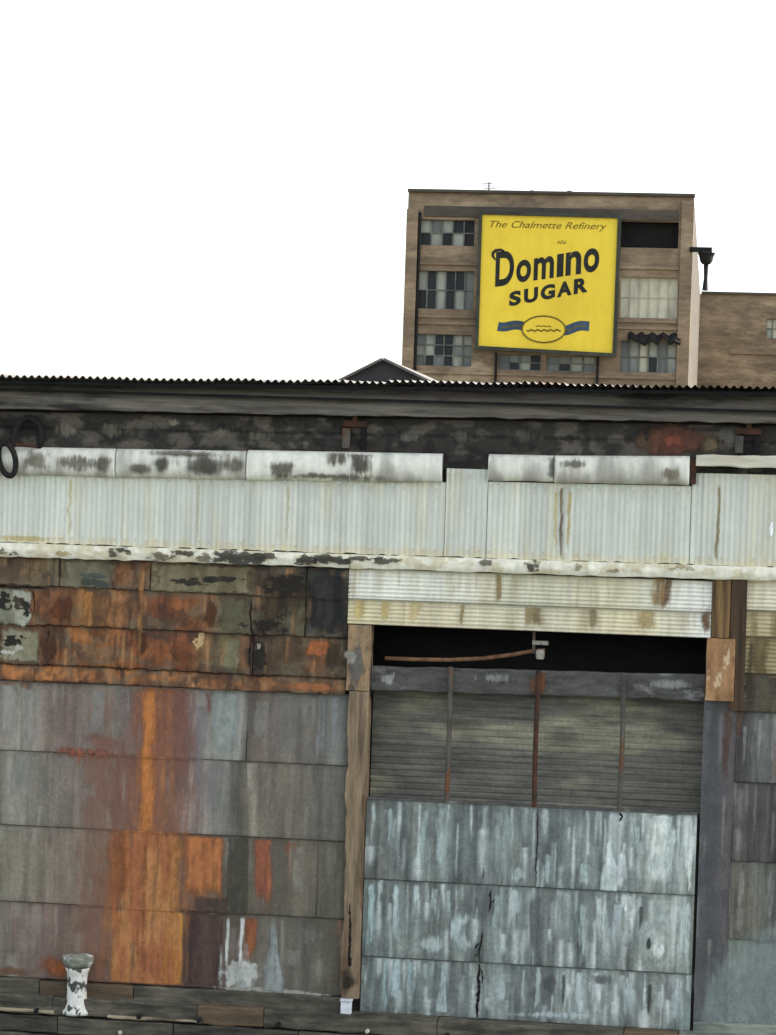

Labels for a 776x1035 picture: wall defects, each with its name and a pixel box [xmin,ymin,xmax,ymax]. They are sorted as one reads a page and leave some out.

leakage [277,453,385,481]
rust [636,424,718,456]
peeling [0,583,38,661]
rust [307,640,330,656]
rust [105,688,223,985]
rust [243,919,257,961]
leakage [184,838,330,996]
rust [255,840,271,899]
leakage [383,885,471,1003]
crack [475,934,484,1017]
leakage [513,972,611,1020]
leakage [578,815,693,962]